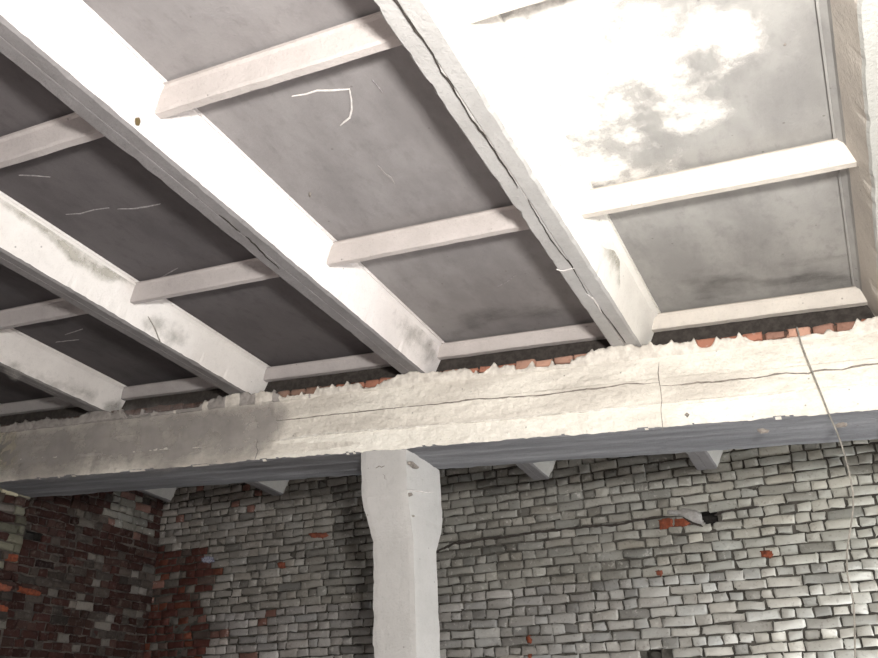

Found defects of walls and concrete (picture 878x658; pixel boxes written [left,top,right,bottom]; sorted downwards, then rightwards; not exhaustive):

crack [219,215,280,270]
crack [393,0,625,342]
water stain [504,0,761,186]
crack [255,363,878,458]